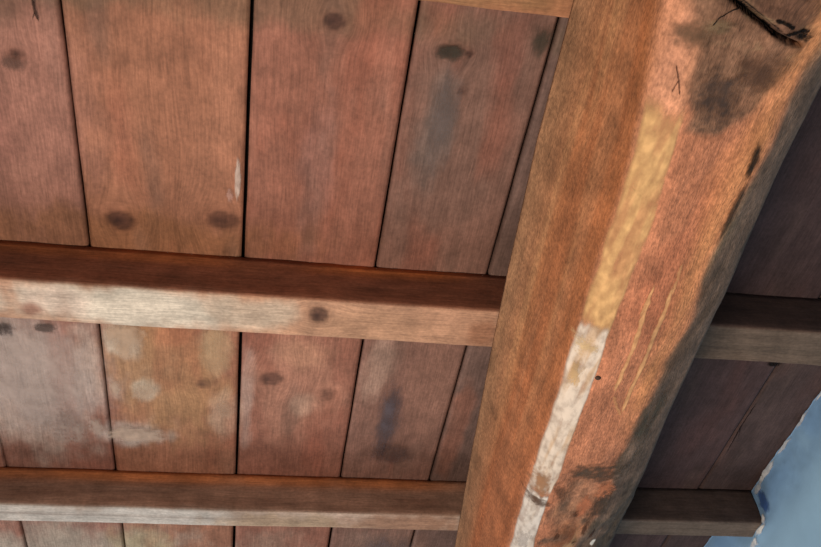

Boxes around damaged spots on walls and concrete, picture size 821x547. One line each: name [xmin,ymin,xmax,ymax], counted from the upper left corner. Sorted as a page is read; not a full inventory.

crack [713,0,812,42]
peeling [510,108,682,547]
leakage [573,466,619,514]